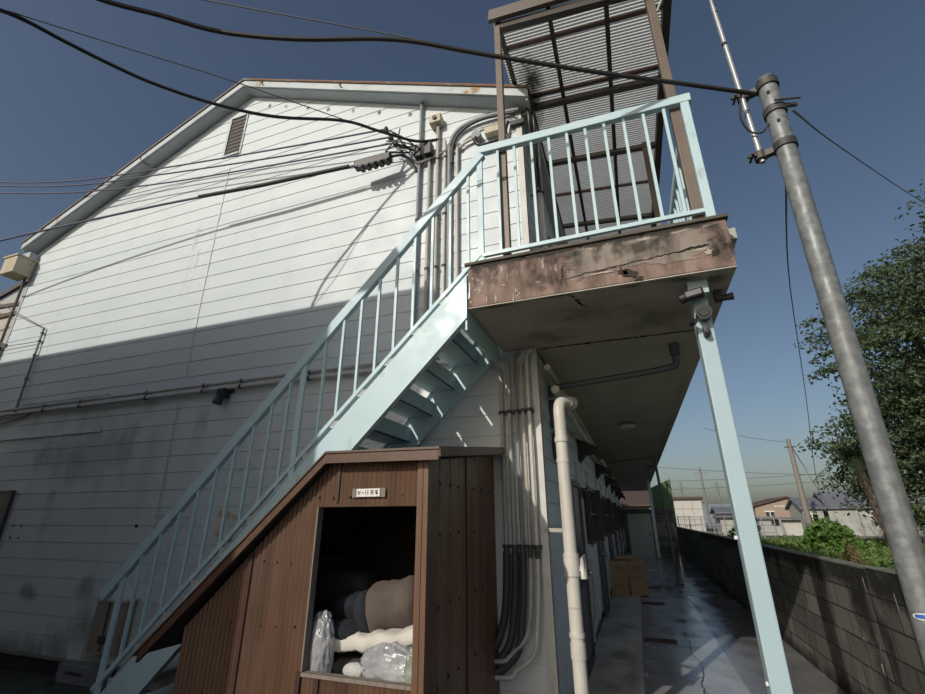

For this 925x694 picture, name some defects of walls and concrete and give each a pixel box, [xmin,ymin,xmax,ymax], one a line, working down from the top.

peeling [541,222,720,282]
peeling [470,266,520,303]
crack [689,640,709,694]